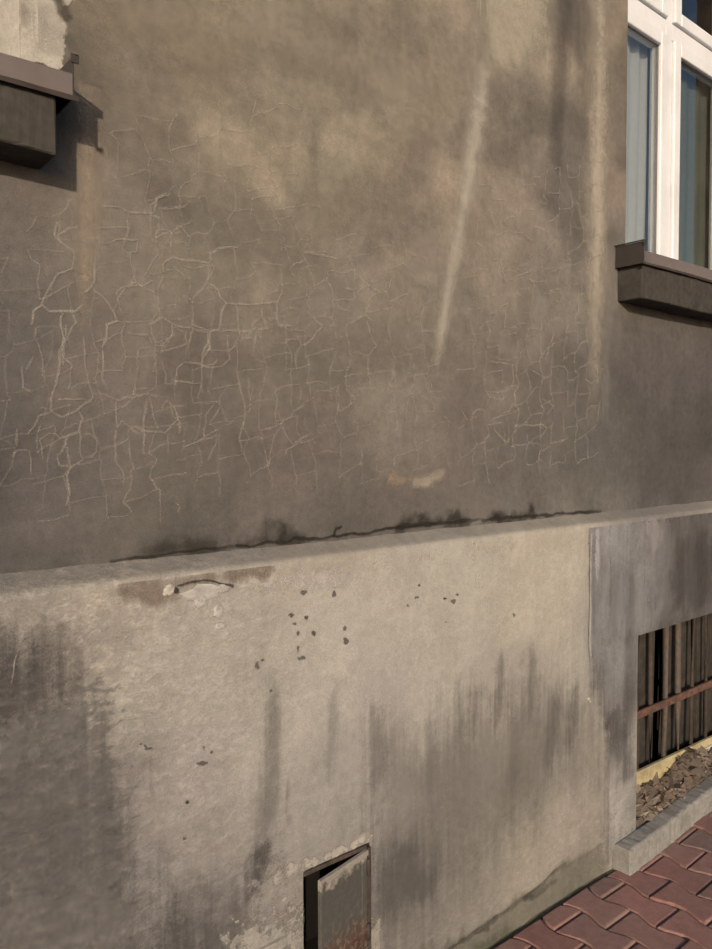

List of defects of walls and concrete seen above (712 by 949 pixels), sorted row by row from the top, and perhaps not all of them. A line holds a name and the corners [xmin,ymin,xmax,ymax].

peeling [19,0,72,70]
water stain [446,511,469,527]
water stain [492,505,535,523]
water stain [152,541,215,555]
water stain [263,524,303,546]
peeling [162,583,231,629]
spalling [220,833,373,949]
spalling [371,919,381,949]